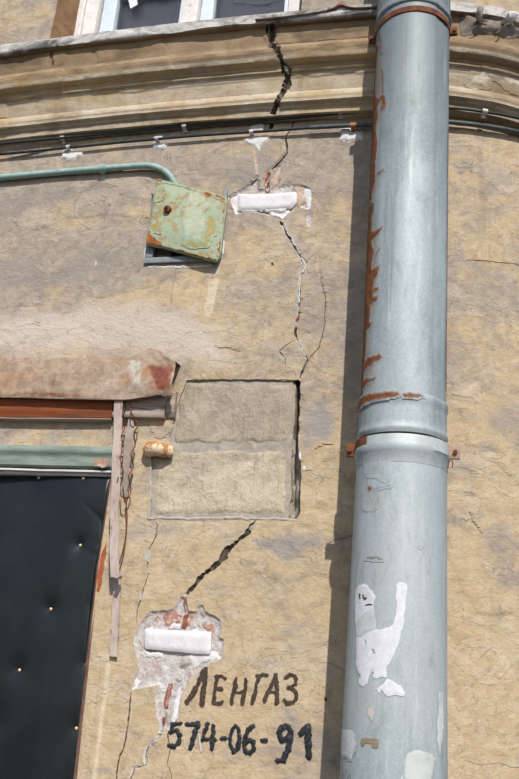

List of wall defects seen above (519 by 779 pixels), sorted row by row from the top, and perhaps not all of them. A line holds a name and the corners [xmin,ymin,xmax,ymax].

crack [250,23,294,192]
flaking render [228,163,313,227]
crack [279,219,326,379]
crack [136,522,158,622]
crack [183,520,256,608]
flaking render [131,597,224,733]
crack [116,690,172,779]